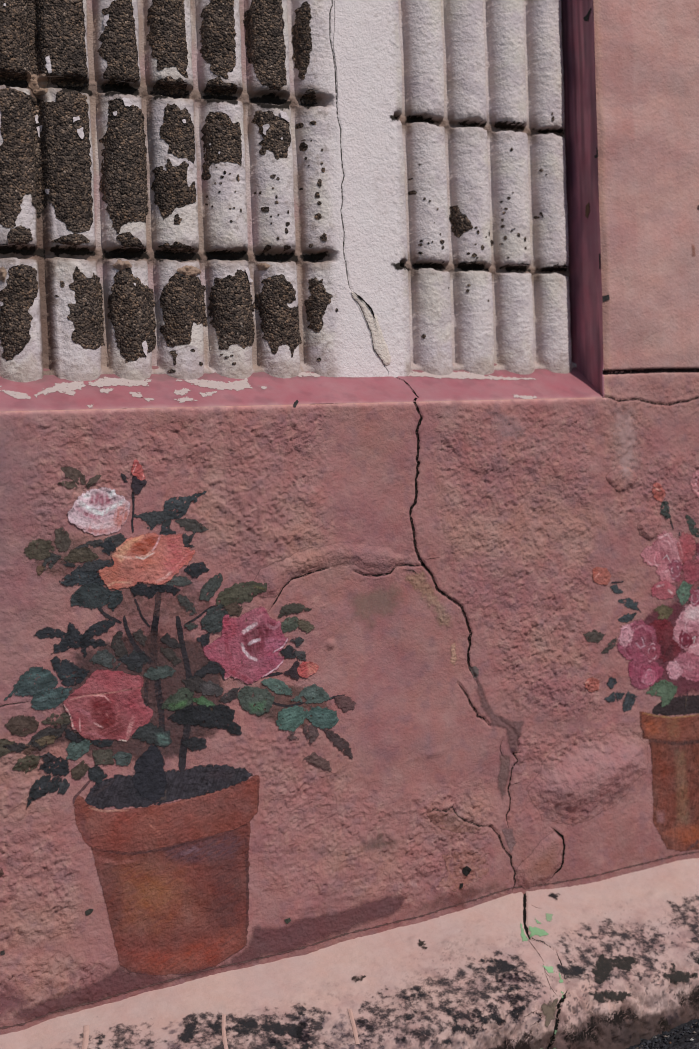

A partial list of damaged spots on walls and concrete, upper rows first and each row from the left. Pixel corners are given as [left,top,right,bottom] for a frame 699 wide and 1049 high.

peeling [0,0,325,253]
peeling [0,264,38,361]
peeling [0,377,154,402]
peeling [55,266,338,403]
crack [329,0,487,722]
peeling [408,371,535,381]
crack [608,397,699,406]
crack [273,568,328,605]
damp [557,919,673,988]
damp [668,896,699,964]
damp [78,951,541,1049]